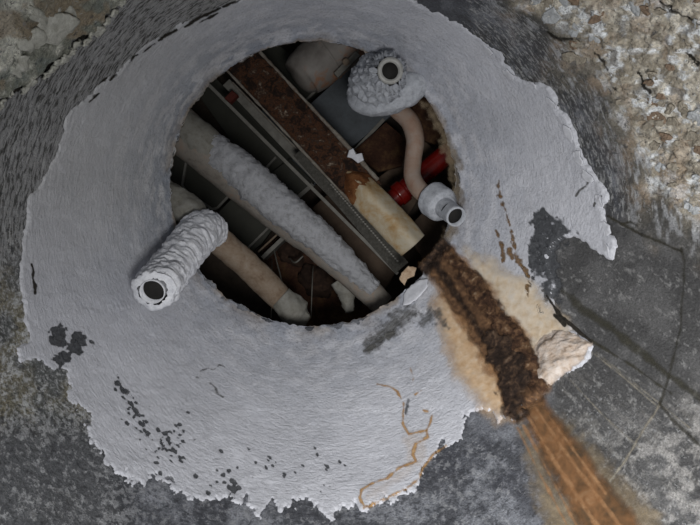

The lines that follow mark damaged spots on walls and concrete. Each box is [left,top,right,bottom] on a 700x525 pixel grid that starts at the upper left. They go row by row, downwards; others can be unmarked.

flaking render [530,0,600,65]
flaking render [588,10,604,24]
flaking render [629,0,700,28]
flaking render [613,71,700,165]
peeling [525,208,579,305]
peeling [601,221,611,255]
peeling [48,323,94,370]
corrosion [420,183,656,525]
crack [546,295,592,343]
peeling [114,376,186,476]
crack [602,357,697,482]
peeling [206,466,242,500]